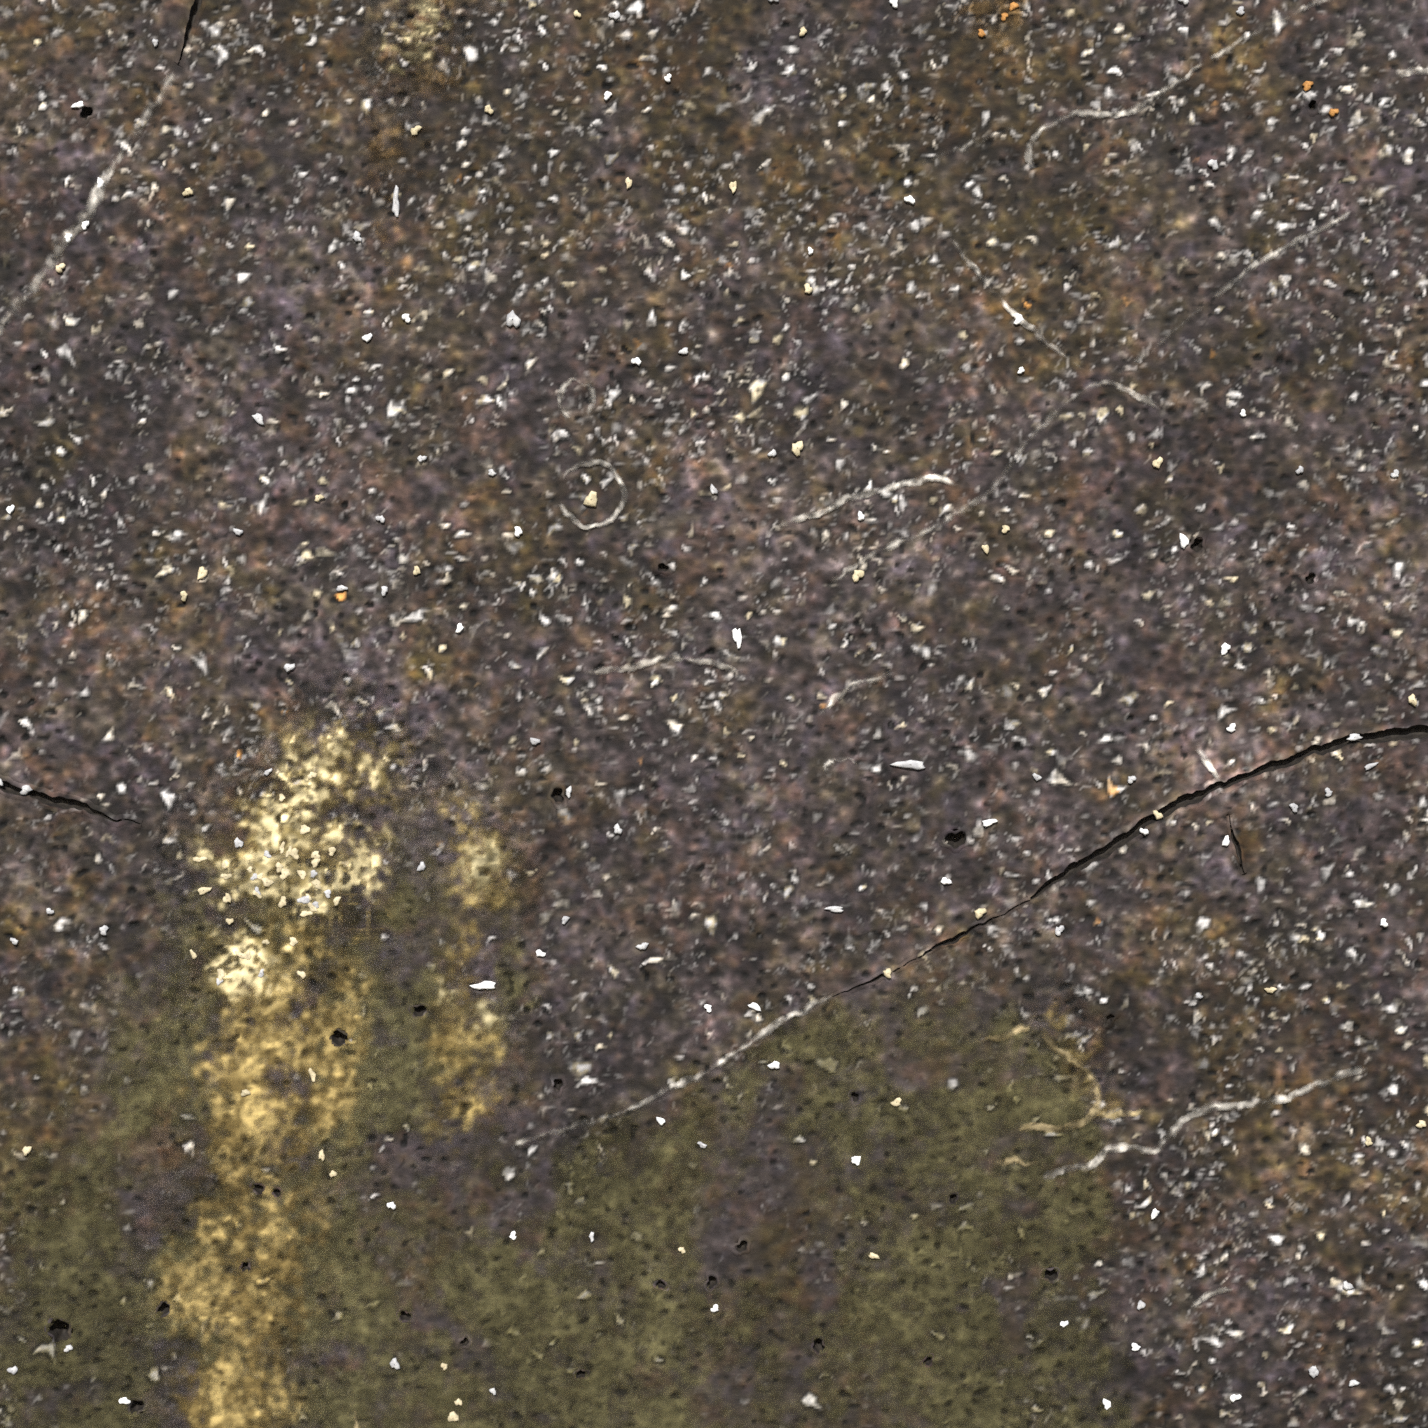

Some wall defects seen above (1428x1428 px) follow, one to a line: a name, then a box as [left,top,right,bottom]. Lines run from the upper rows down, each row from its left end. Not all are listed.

crack [0,774,143,829]
water stain [458,840,503,905]
crack [630,720,1428,1109]
water stain [430,978,501,1067]
water stain [164,727,385,1428]
water stain [445,1090,497,1118]
crack [987,1026,1361,1177]